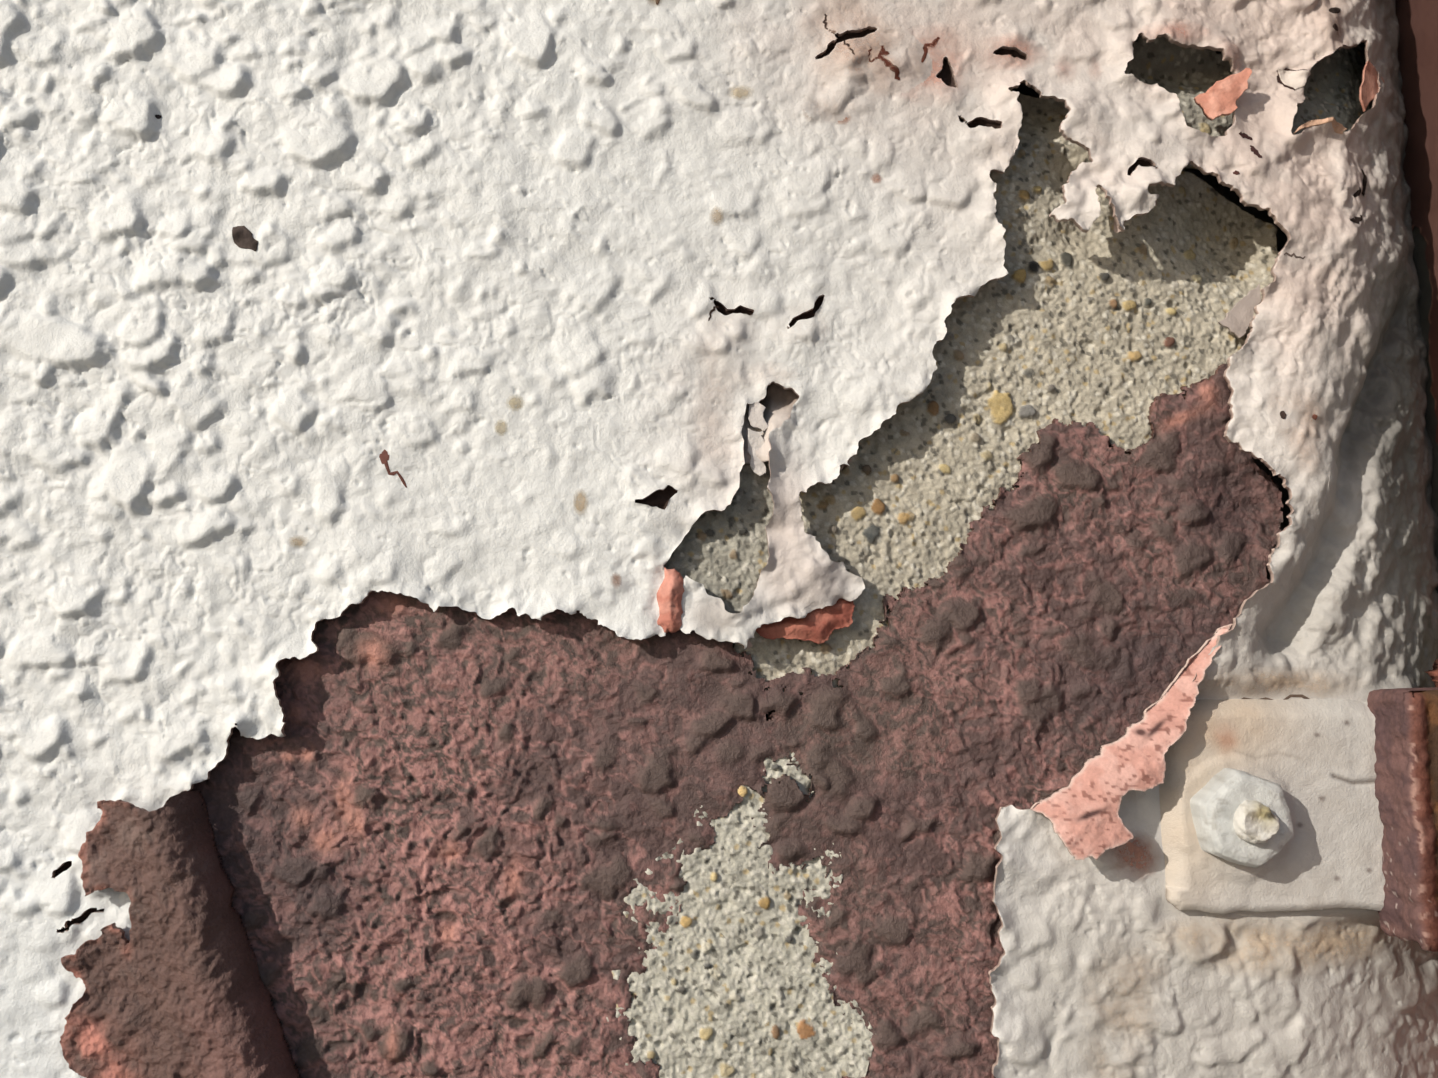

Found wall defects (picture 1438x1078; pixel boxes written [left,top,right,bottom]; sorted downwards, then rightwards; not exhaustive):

peeling [1125,36,1252,137]
peeling [1277,43,1385,135]
peeling [60,89,1283,1078]